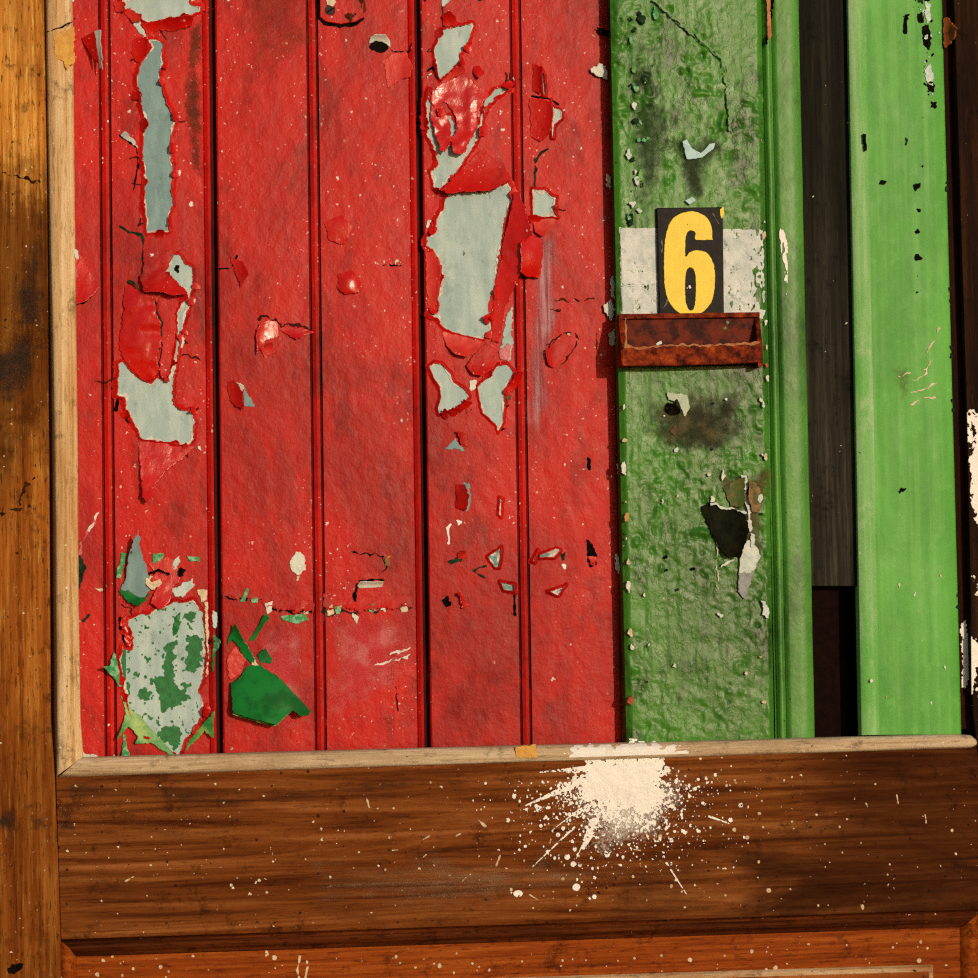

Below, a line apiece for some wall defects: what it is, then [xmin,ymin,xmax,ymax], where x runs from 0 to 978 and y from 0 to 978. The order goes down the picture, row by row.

peeling [53,27,103,70]
spalling [903,0,940,109]
spalling [626,66,650,227]
spalling [74,249,100,305]
peeling [94,0,214,502]
peeling [419,0,566,435]
spalling [351,551,391,602]
spalling [472,544,519,616]
spalling [528,546,566,569]
spalling [586,539,597,568]
peeling [702,469,764,599]
peeling [103,533,311,756]